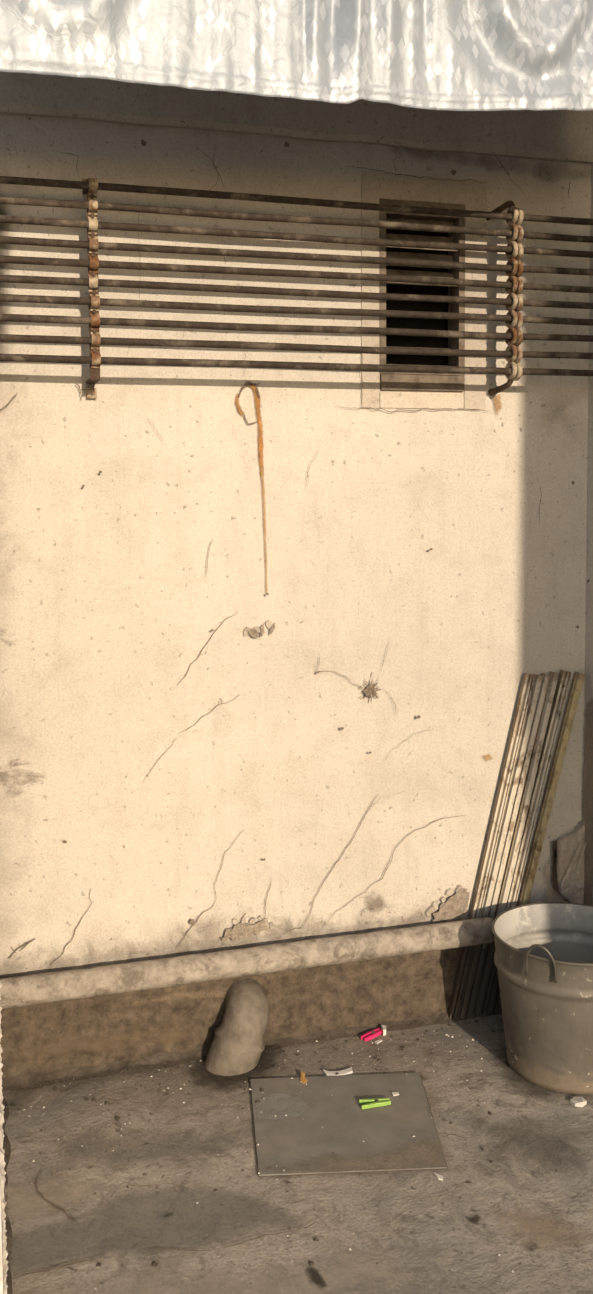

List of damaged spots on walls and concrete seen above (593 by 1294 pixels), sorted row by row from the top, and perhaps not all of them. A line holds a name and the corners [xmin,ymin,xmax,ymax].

rust [235,381,267,592]
crack [177,610,239,685]
crack [142,694,240,783]
water stain [582,700,593,905]
crack [176,830,244,948]
crack [263,791,466,935]
peeling [424,885,470,924]